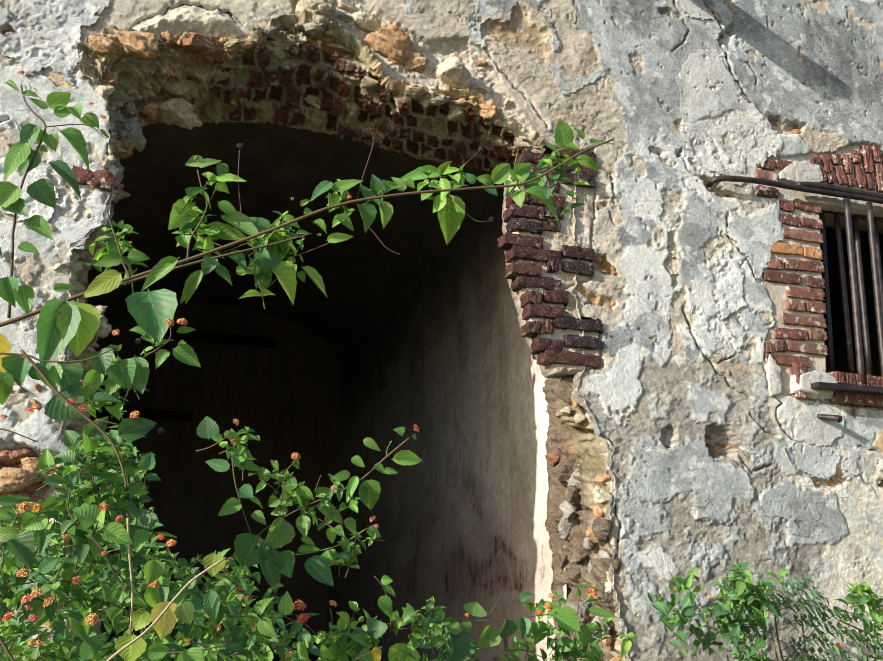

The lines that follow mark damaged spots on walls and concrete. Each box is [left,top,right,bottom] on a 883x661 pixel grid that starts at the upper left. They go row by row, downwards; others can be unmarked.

crack [706,4,773,117]
spalling [0,0,617,387]
spalling [18,384,44,405]
spalling [0,410,91,534]
spalling [542,348,631,661]
spalling [705,427,740,458]
crack [682,308,793,440]